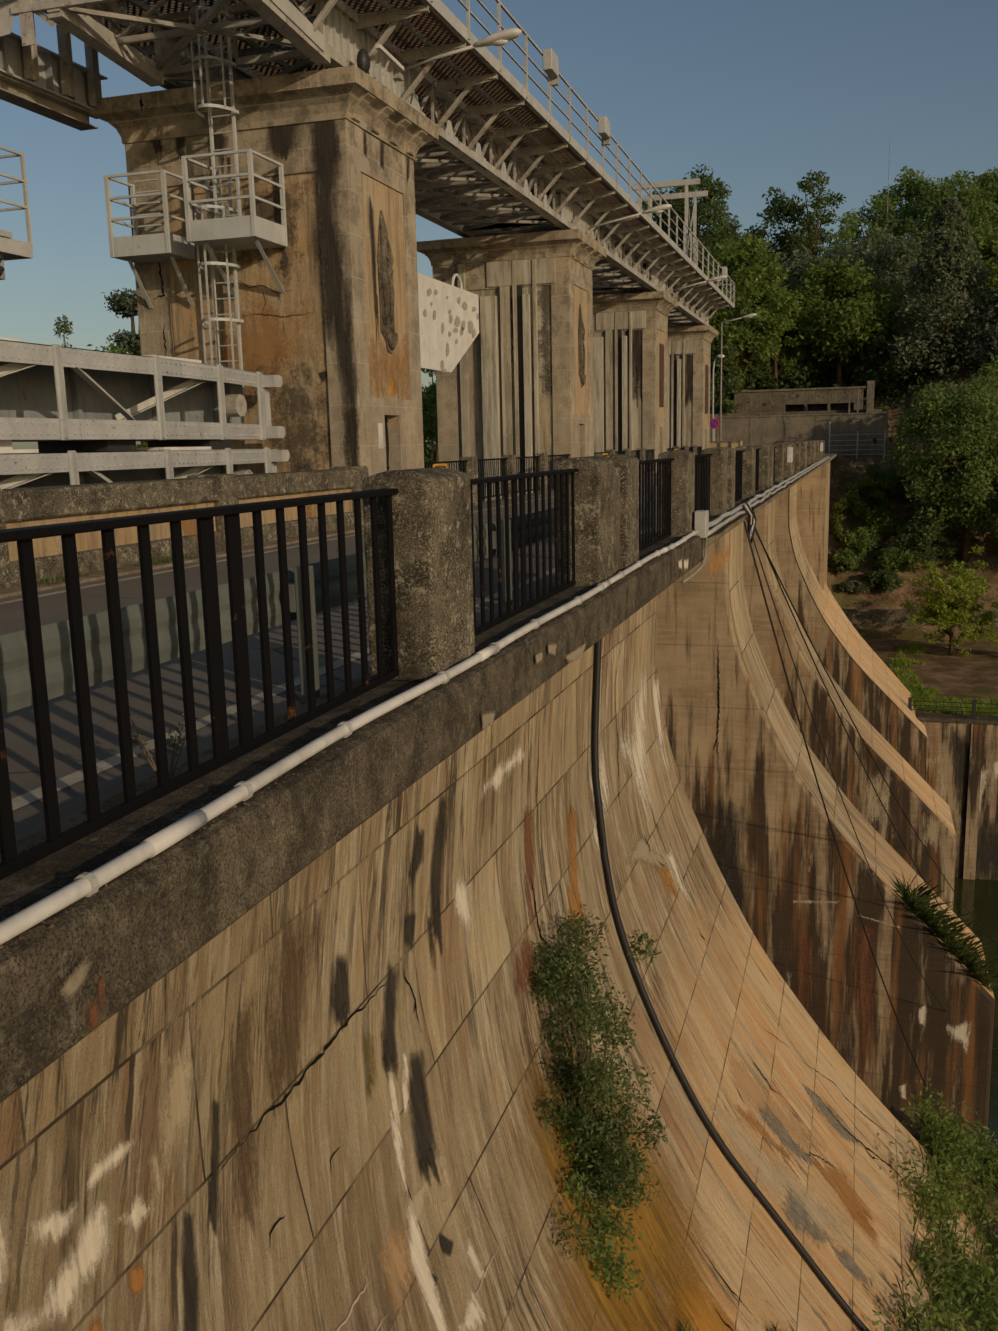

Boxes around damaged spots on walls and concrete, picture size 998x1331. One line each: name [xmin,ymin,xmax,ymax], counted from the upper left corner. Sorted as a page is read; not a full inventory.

damp [236,120,359,472]
damp [369,199,379,338]
damp [493,285,552,448]
damp [710,801,751,921]
damp [860,778,890,821]
crack [218,970,421,1174]
damp [332,958,350,1031]
damp [947,1022,971,1050]
damp [3,1203,108,1331]
damp [87,1143,129,1188]
damp [125,1197,150,1230]
damp [368,966,485,1331]